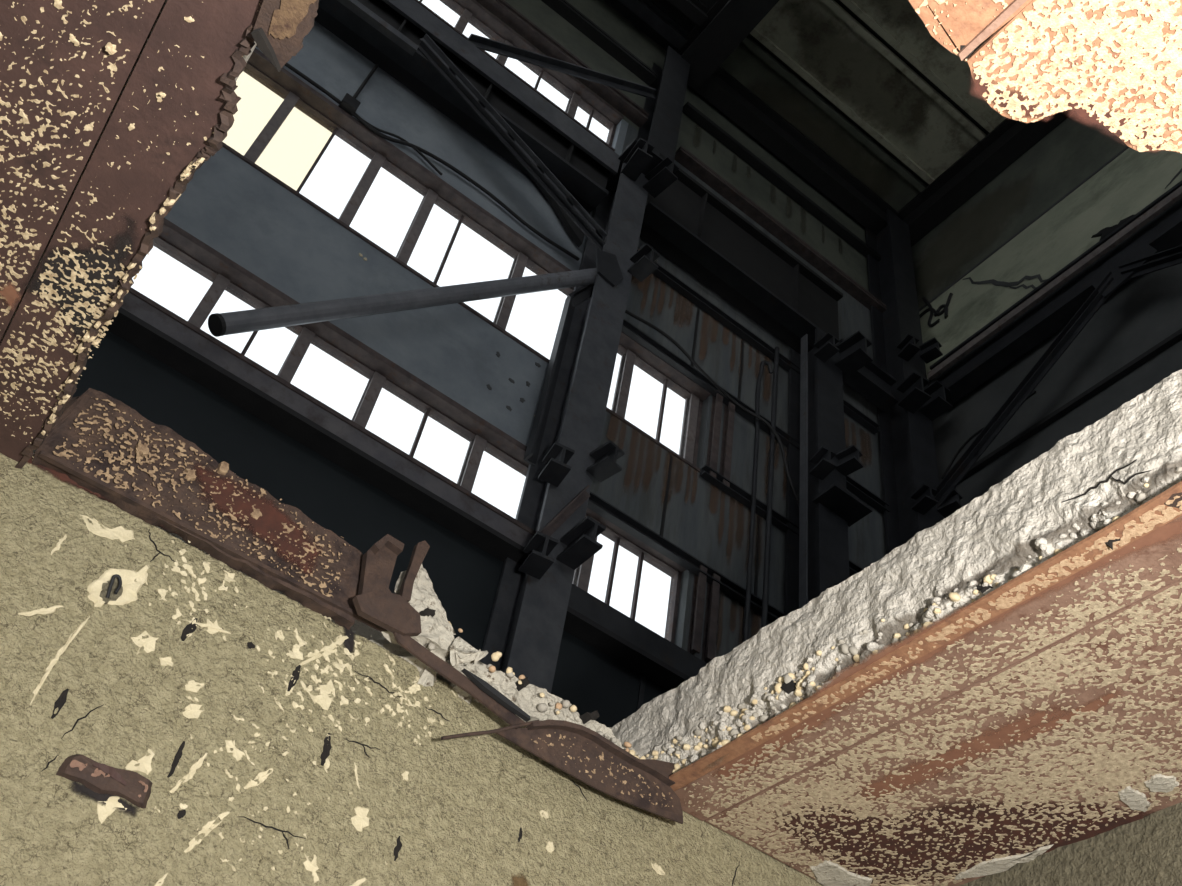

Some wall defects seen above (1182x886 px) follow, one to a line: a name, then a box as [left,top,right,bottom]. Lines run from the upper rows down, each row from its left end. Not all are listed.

peeling [107,67,214,170]
peeling [915,0,1182,153]
corrosion [972,73,1162,151]
peeling [0,0,154,464]
crack [962,274,1047,289]
peeling [53,398,350,597]
corrosion [196,466,319,574]
crack [1062,459,1152,503]
spalling [370,369,1182,886]
corrosion [712,492,1182,780]
corrosion [861,692,1118,802]
corrosion [778,801,1150,885]